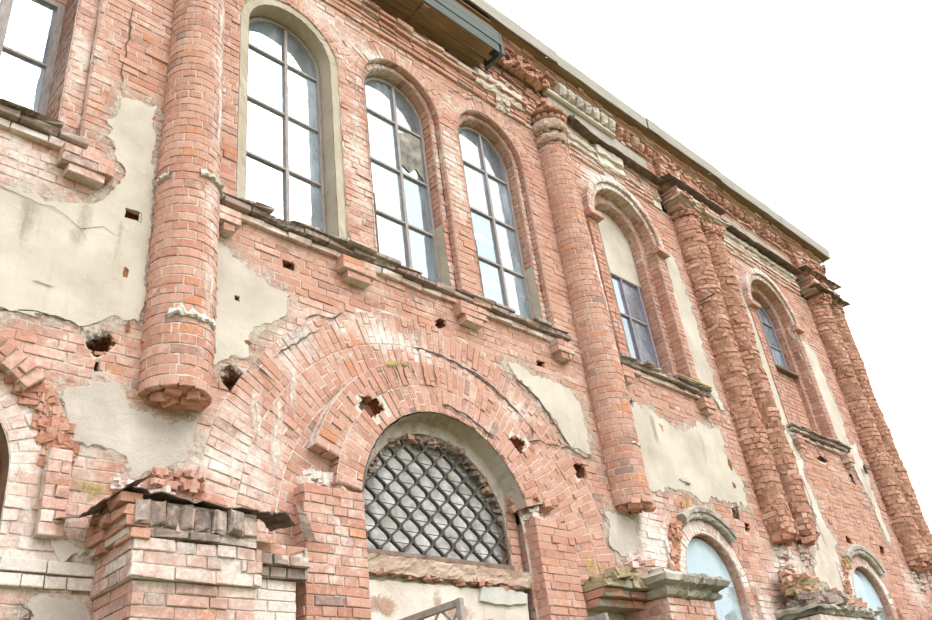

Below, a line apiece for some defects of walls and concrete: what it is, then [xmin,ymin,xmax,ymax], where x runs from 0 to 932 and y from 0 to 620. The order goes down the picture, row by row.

crack [121,5,135,93]
peeling [0,83,163,339]
peeling [213,240,292,377]
crack [248,313,346,381]
peeling [0,367,206,495]
peeling [501,356,596,457]
peeling [631,393,753,518]
peeling [741,294,853,595]
peeling [42,518,86,564]
peeling [602,498,653,569]
spalling [667,521,683,572]
peeling [5,589,91,620]